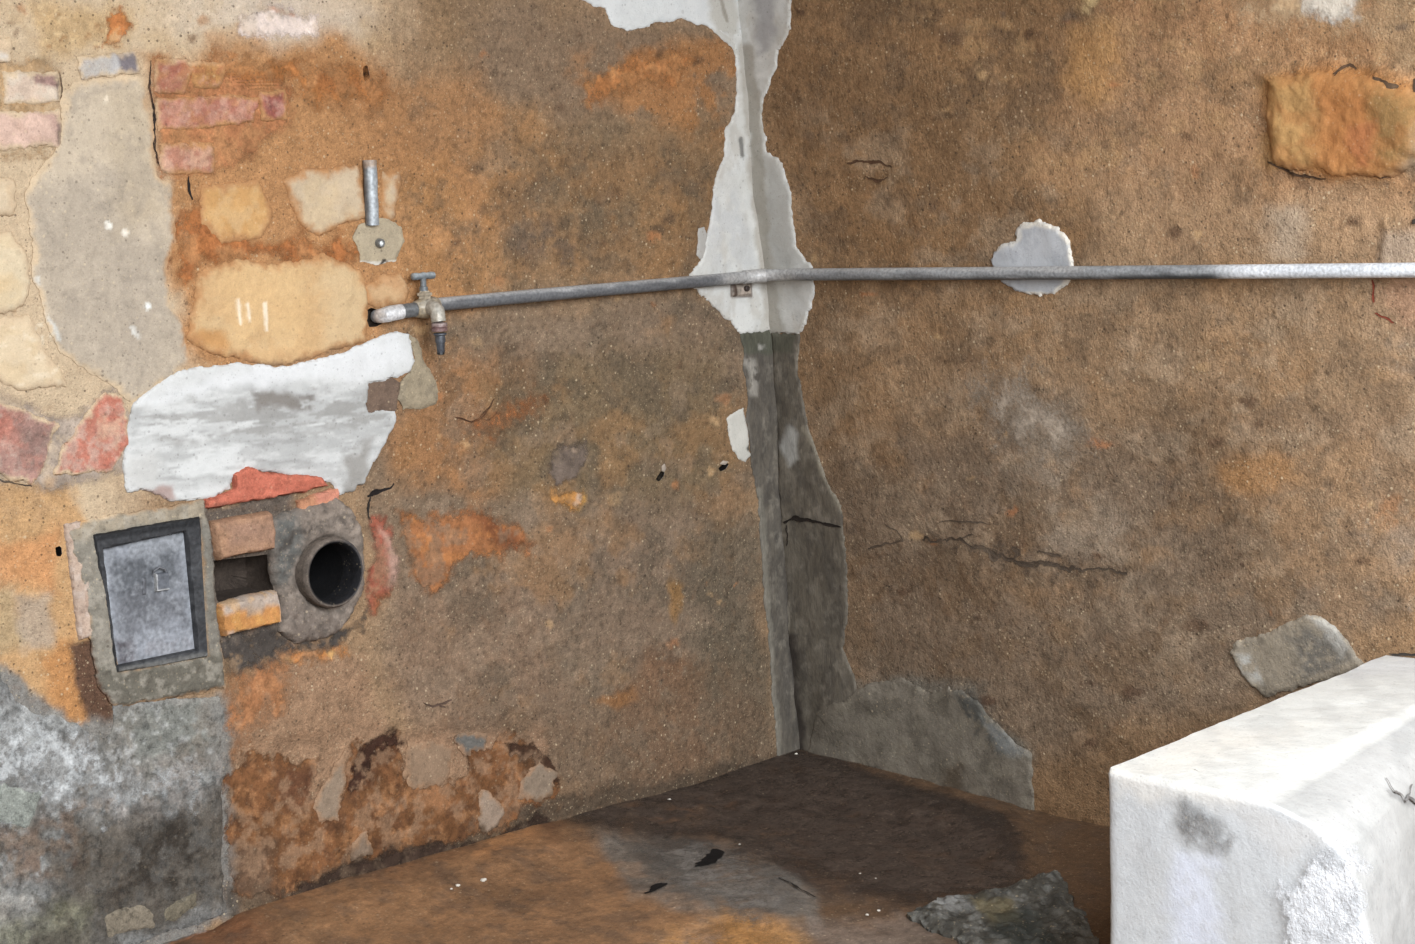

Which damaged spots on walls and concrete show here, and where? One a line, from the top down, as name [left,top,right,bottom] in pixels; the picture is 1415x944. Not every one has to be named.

efflorescence [1249,0,1375,24]
peeling [0,7,415,509]
peeling [584,0,1035,810]
corrosion [366,510,535,615]
crack [783,515,841,546]
crack [868,520,1127,575]
leakage [0,722,169,808]
crack [1387,779,1415,803]